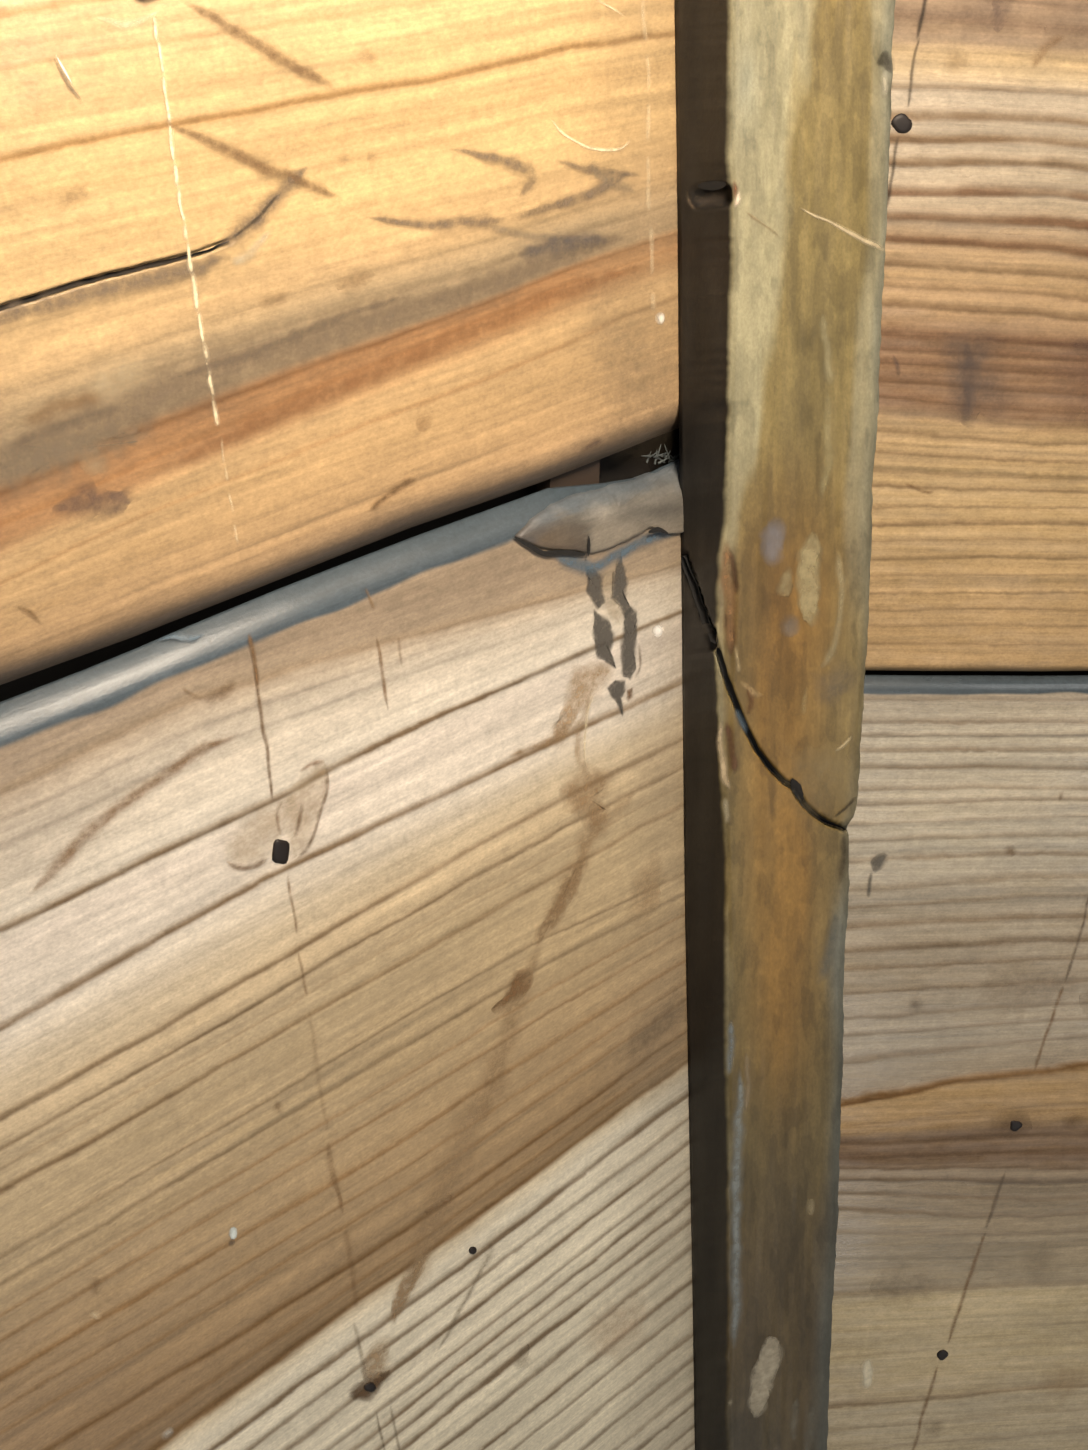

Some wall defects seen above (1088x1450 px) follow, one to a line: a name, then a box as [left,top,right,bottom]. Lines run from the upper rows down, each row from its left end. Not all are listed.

crack [0,170,303,323]
crack [514,536,590,557]
crack [648,527,854,830]
damp [492,974,531,1009]
damp [392,1251,425,1319]